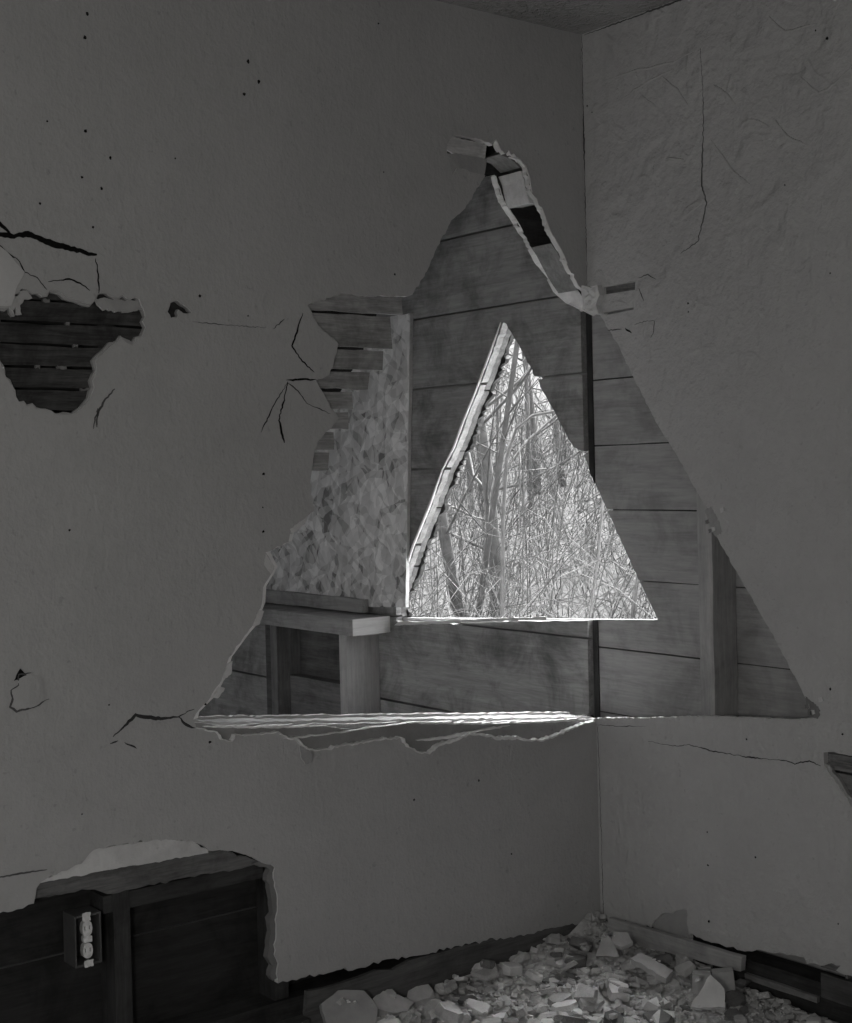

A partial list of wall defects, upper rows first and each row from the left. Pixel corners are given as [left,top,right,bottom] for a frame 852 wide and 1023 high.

crack [581,0,682,273]
crack [681,51,707,253]
crack [0,222,100,291]
flaking render [0,289,145,415]
crack [198,314,330,443]
flaking render [308,294,403,471]
flaking render [606,274,655,301]
flaking render [194,516,308,719]
crack [110,709,195,749]
crack [597,724,820,914]
spalling [251,860,277,981]